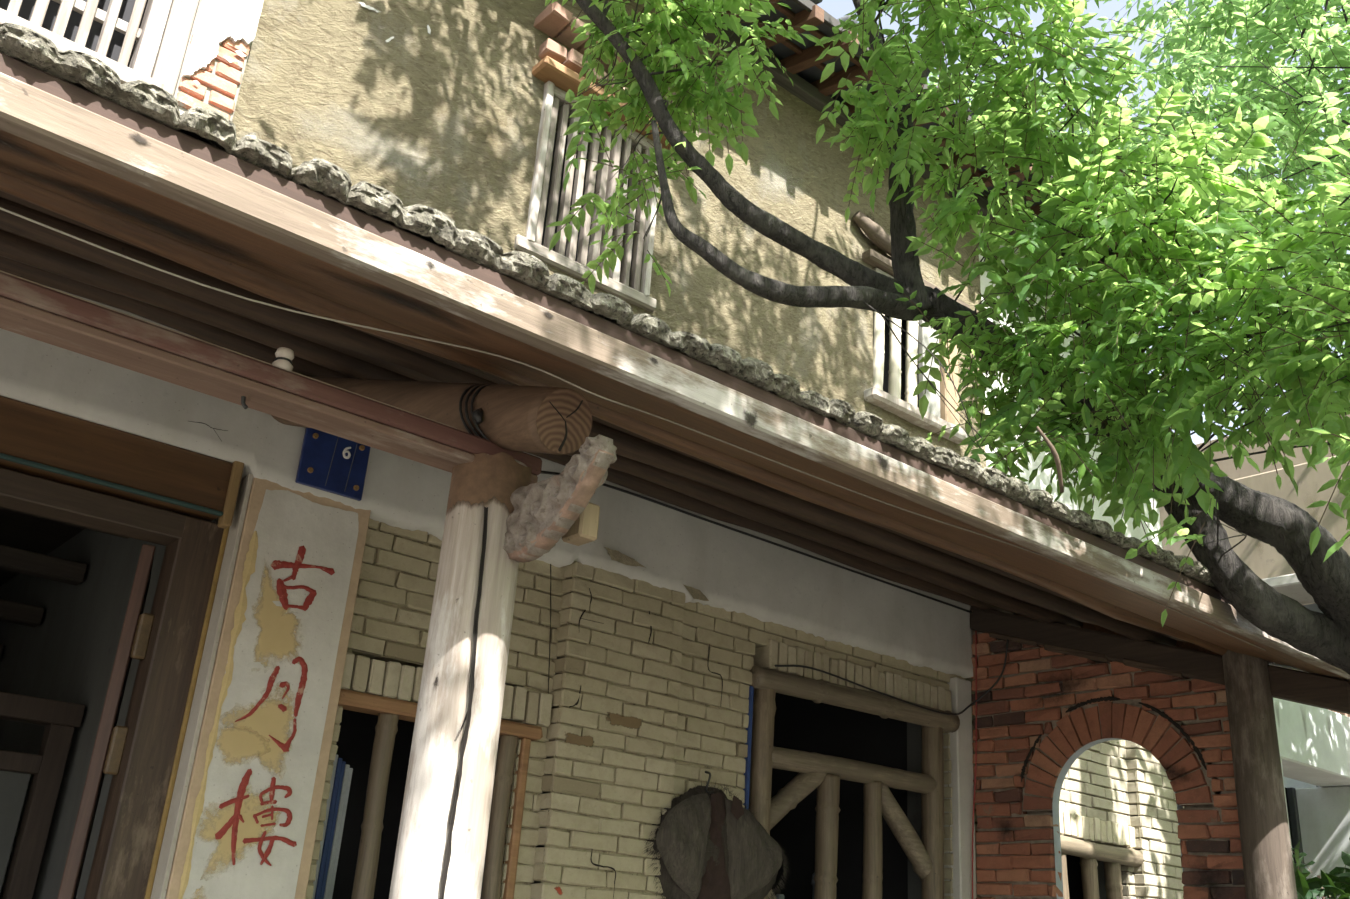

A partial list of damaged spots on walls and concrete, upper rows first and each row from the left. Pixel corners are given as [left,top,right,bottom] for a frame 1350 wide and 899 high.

flaking render [173,0,263,121]
crack [439,507,488,899]